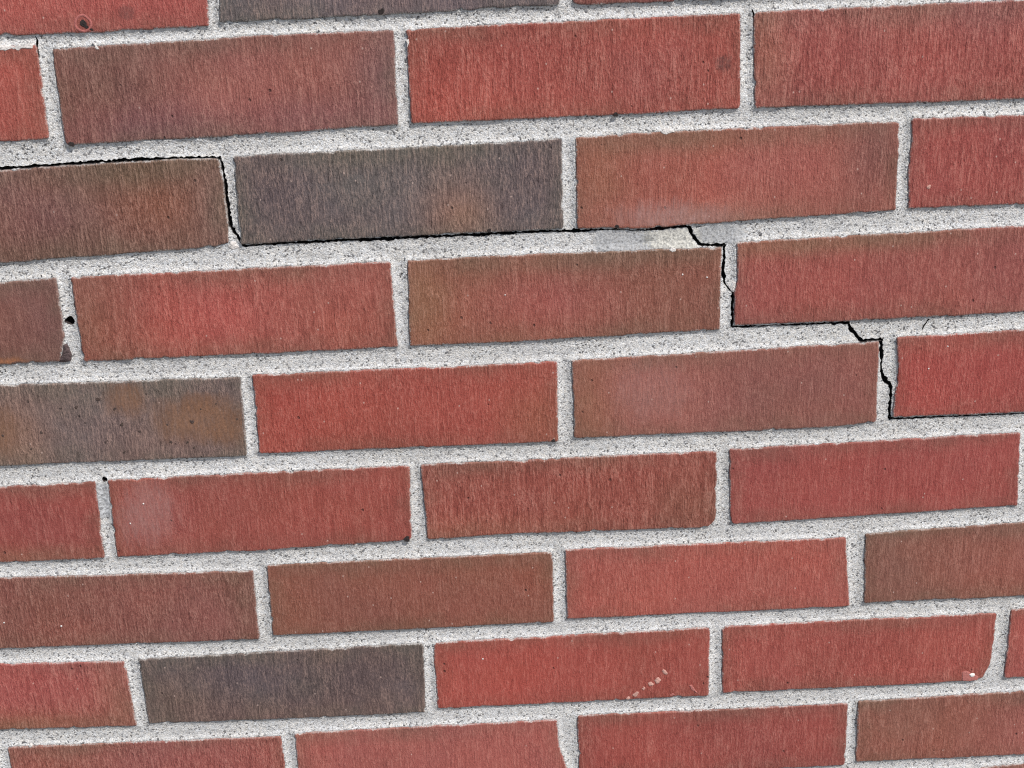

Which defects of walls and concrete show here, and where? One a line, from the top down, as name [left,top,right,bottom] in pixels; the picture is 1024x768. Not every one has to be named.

crack [0,155,1024,420]